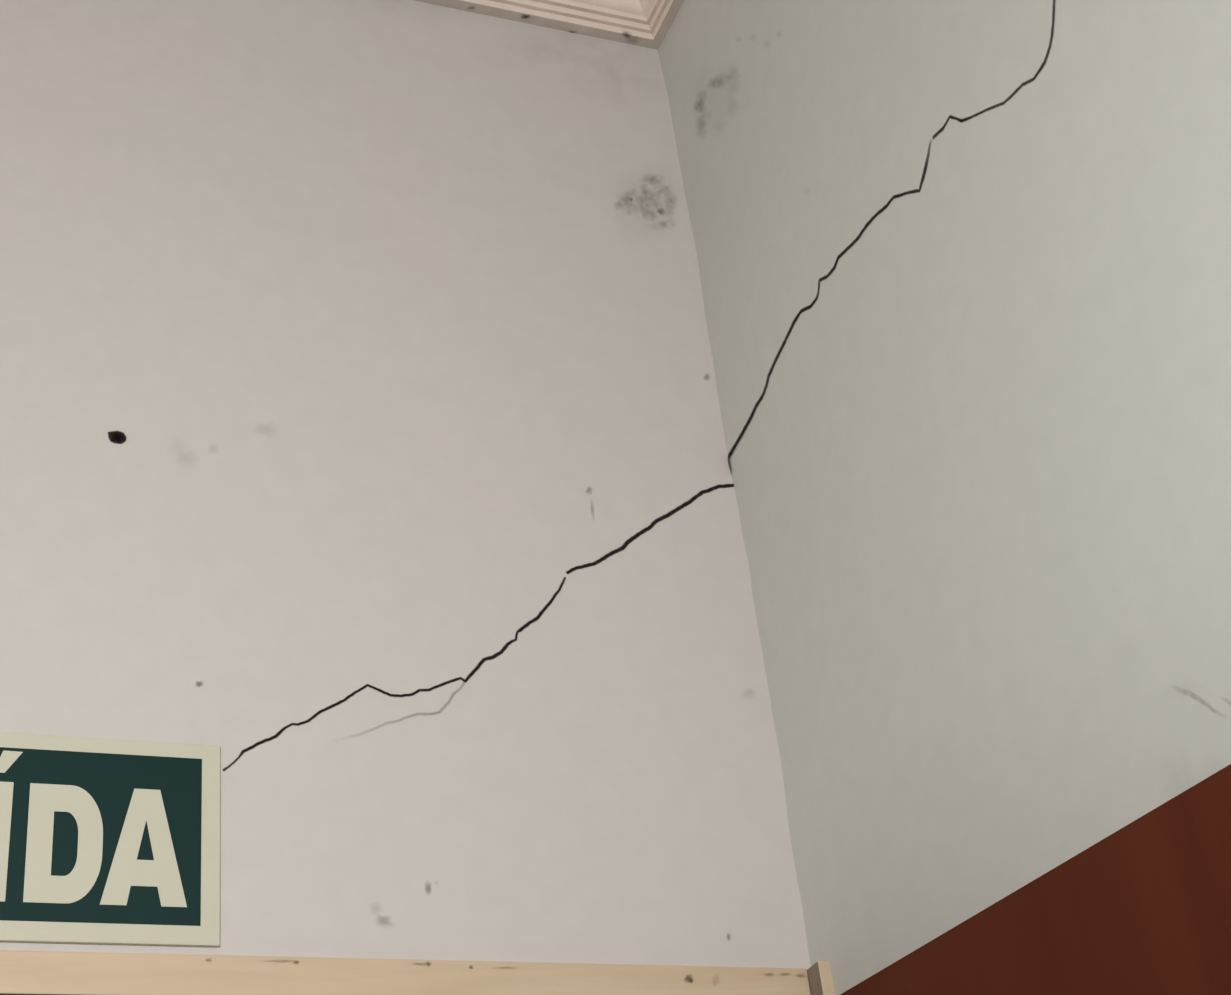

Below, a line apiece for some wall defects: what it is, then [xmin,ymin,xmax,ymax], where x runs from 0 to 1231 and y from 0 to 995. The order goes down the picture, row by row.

crack [223,0,1055,771]